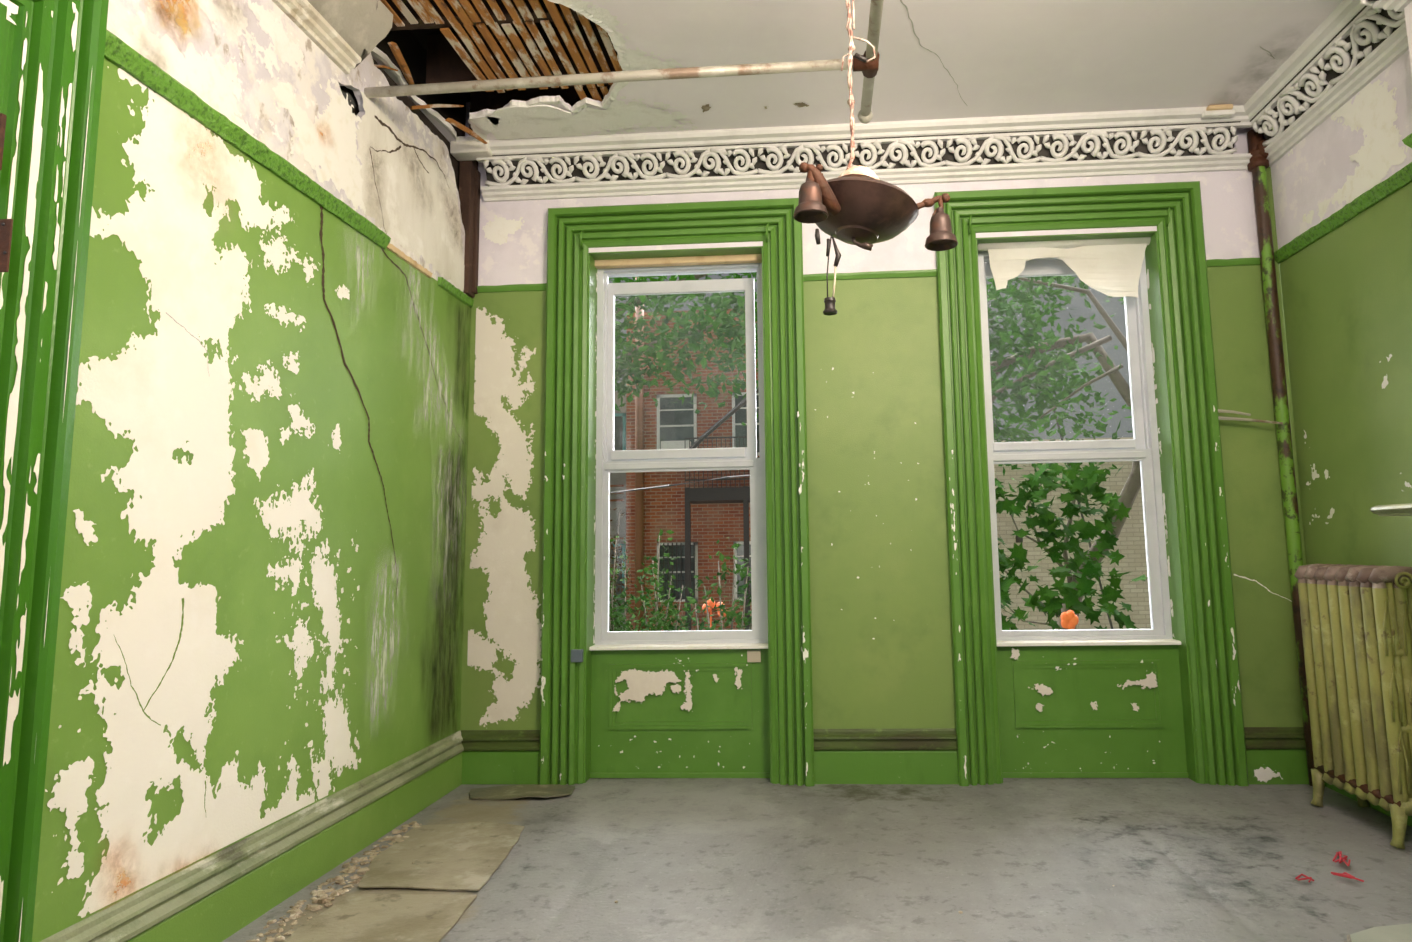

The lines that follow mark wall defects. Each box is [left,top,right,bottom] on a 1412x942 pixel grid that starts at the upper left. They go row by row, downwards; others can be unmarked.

peeling [565,0,686,71]
crack [900,0,967,105]
peeling [116,0,465,294]
peeling [450,93,711,161]
peeling [482,215,525,245]
peeling [0,0,72,766]
crack [318,204,398,594]
peeling [44,66,361,918]
peeling [467,306,565,729]
peeling [606,655,742,712]
peeling [1028,684,1053,712]
peeling [1117,660,1158,711]